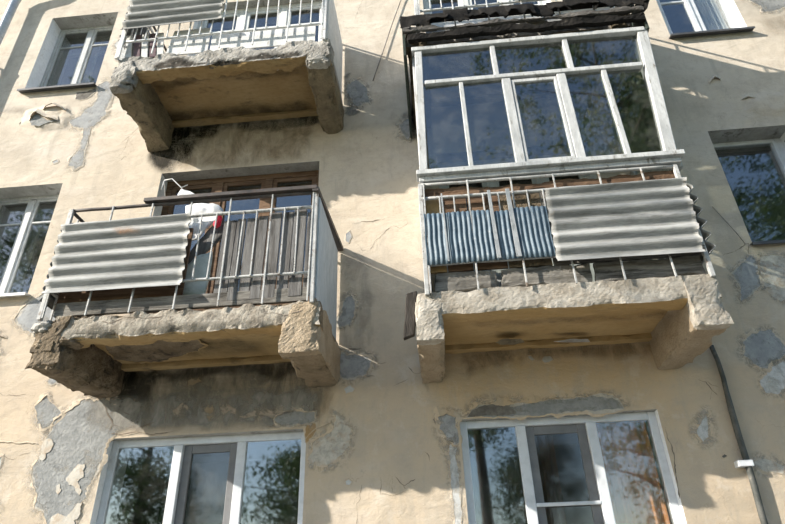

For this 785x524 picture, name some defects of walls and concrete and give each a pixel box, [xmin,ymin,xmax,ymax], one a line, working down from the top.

flaking render [745,0,785,14]
flaking render [19,80,115,172]
water stain [149,109,318,170]
flaking render [336,295,359,329]
flaking render [729,253,785,304]
water stain [90,362,321,431]
flaking render [740,327,785,398]
flaking render [28,373,119,524]
flaking render [273,407,354,471]
flaking render [432,391,627,524]